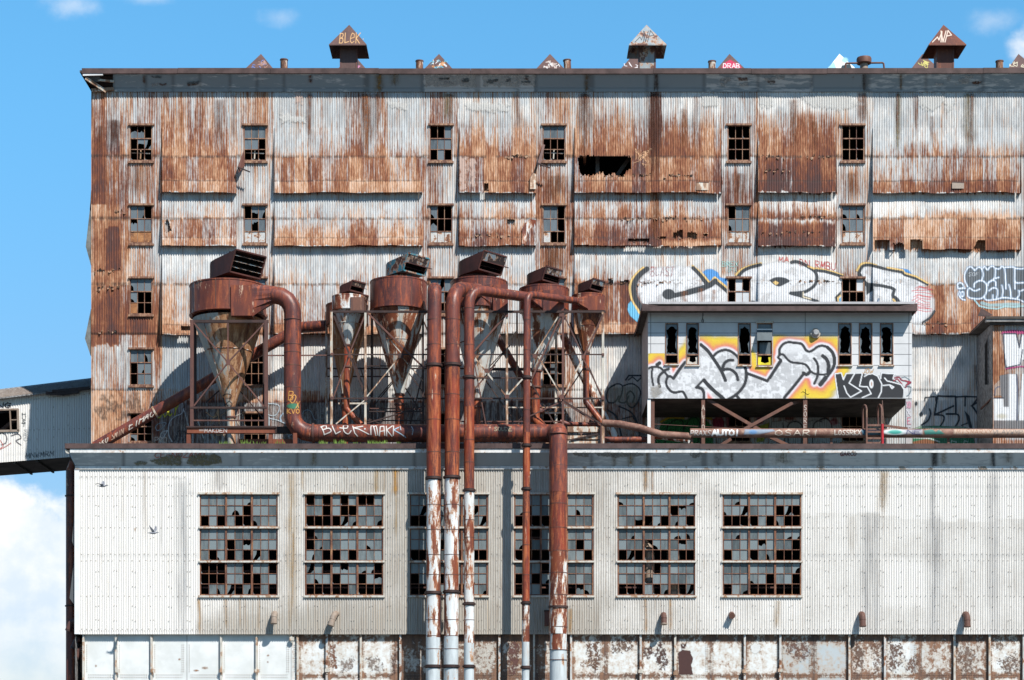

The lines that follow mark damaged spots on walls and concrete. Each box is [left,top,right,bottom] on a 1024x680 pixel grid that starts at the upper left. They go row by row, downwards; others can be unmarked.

corrosion [362,75,381,138]
corrosion [581,75,591,154]
corrosion [649,75,660,169]
peeling [329,644,396,676]
peeling [476,641,520,677]
peeling [580,638,693,675]
peeling [783,640,812,662]
peeling [852,641,920,675]
peeling [956,643,976,674]
peeling [992,640,1022,675]